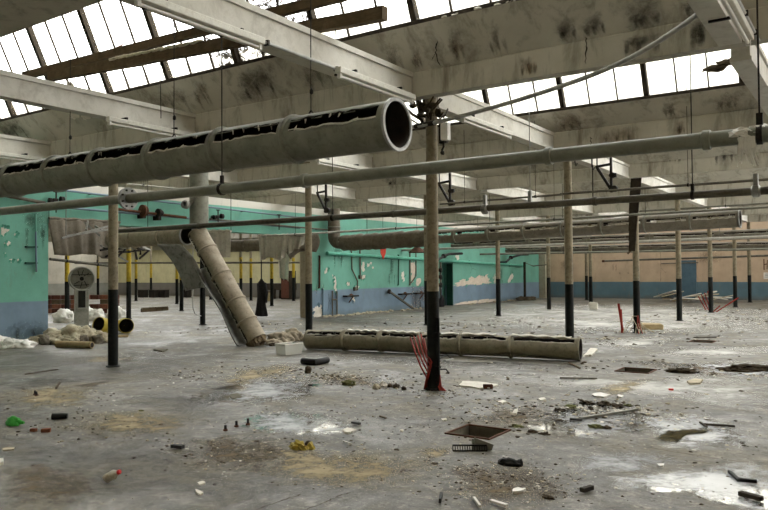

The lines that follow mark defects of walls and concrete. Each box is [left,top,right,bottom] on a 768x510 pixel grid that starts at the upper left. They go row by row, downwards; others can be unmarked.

peeling [324,262,374,304]
peeling [454,274,496,287]